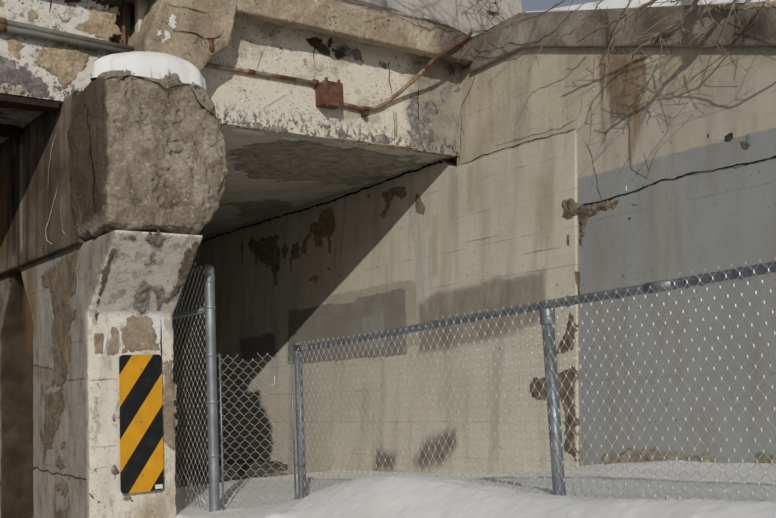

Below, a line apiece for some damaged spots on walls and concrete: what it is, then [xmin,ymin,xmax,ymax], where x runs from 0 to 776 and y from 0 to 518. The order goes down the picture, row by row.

spalling [0,35,98,98]
spalling [60,0,124,41]
spalling [306,37,364,63]
crack [83,104,95,207]
crack [202,72,776,242]
peeling [241,206,336,285]
spalling [562,198,618,246]
peeling [94,241,199,355]
spalling [556,313,579,354]
peeling [41,248,79,518]
spalling [530,377,547,401]
spalling [558,366,580,461]